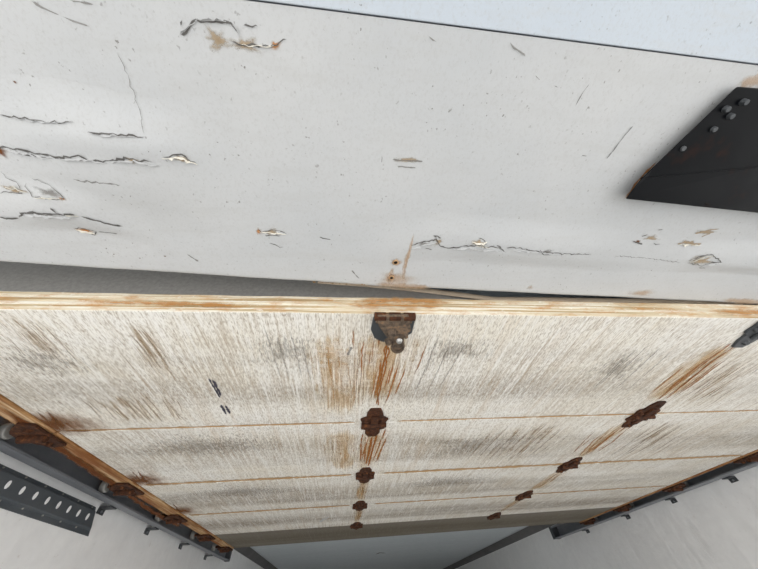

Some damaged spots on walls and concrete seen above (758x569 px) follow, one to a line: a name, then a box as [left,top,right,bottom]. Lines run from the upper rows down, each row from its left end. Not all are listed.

peeling [180,17,286,49]
crack [89,57,144,138]
peeling [0,146,197,167]
peeling [0,175,120,235]
peeling [410,235,504,252]
crack [506,247,589,256]
spalling [678,229,717,247]
rust [361,340,405,405]
rust [653,344,733,400]
rust [11,413,354,432]
rust [574,427,741,465]
rust [384,463,563,474]